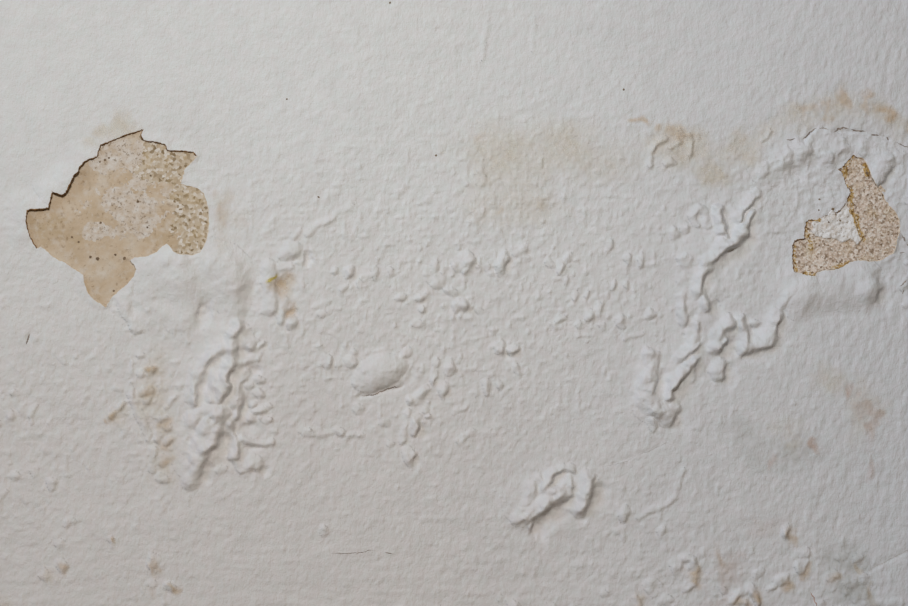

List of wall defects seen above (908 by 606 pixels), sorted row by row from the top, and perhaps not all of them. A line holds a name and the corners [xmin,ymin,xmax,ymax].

peeling [25,129,209,308]
peeling [792,155,900,276]